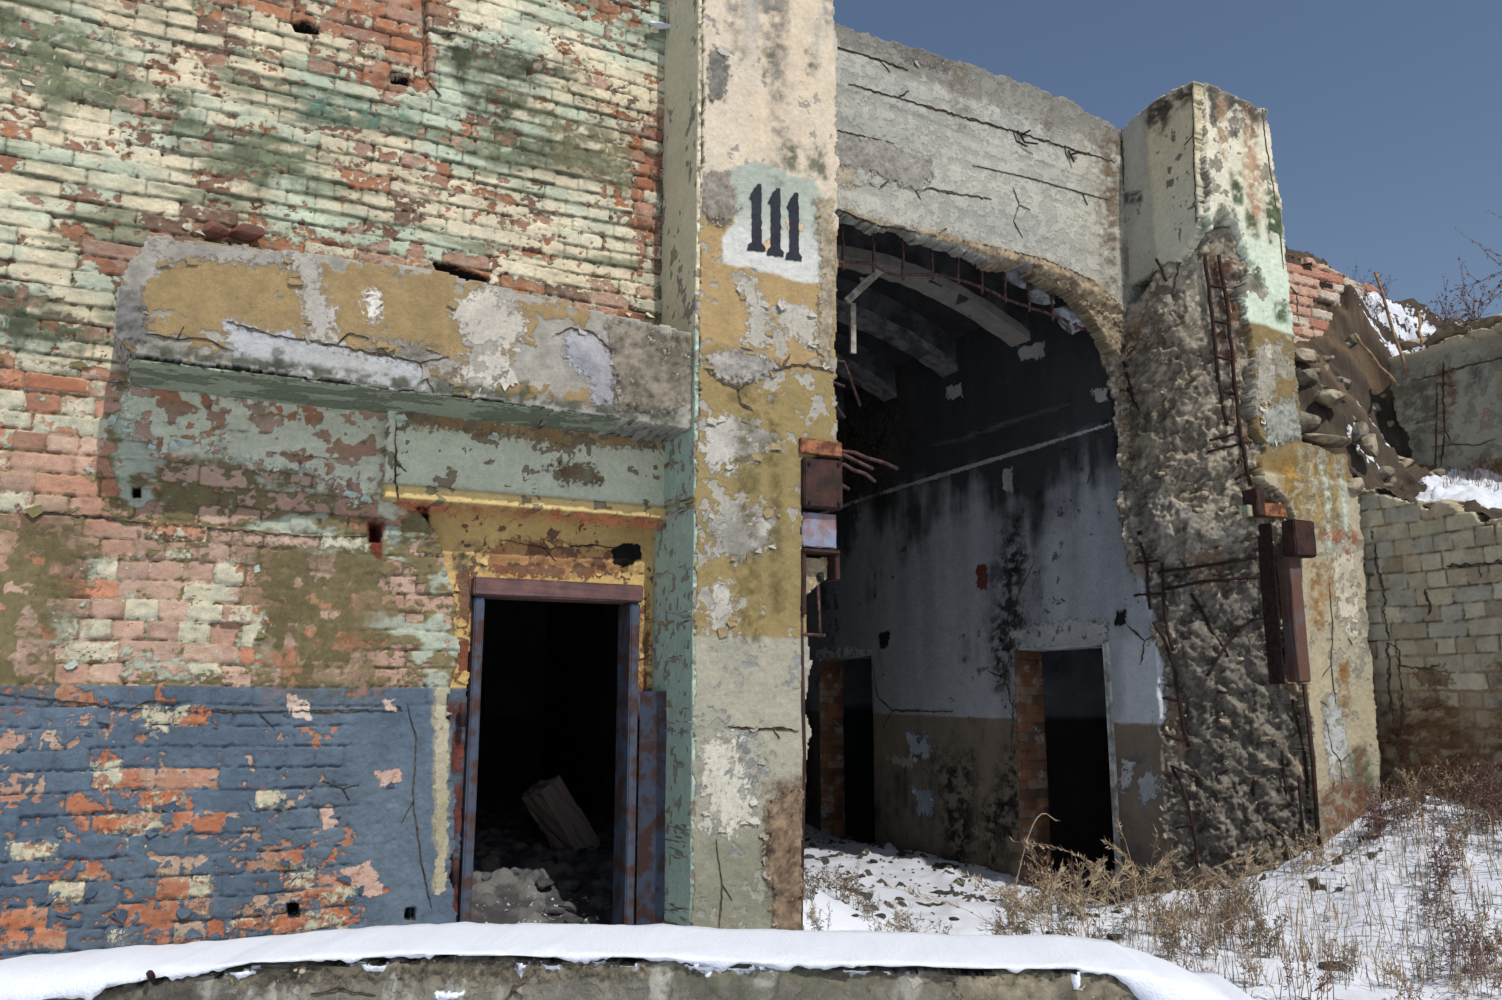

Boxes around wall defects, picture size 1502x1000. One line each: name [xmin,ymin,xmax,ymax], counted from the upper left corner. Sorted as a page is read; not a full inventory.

crack [422,0,457,96]
crack [837,46,1125,306]
flaking render [0,358,666,518]
spalling [148,218,530,398]
spalling [571,114,1127,481]
spalling [1090,258,1247,515]
corrosion [1210,256,1240,364]
peeling [0,835,128,951]
peeling [226,858,384,935]
corrosion [450,857,458,922]
corrosion [447,704,467,839]
spalling [697,726,807,930]